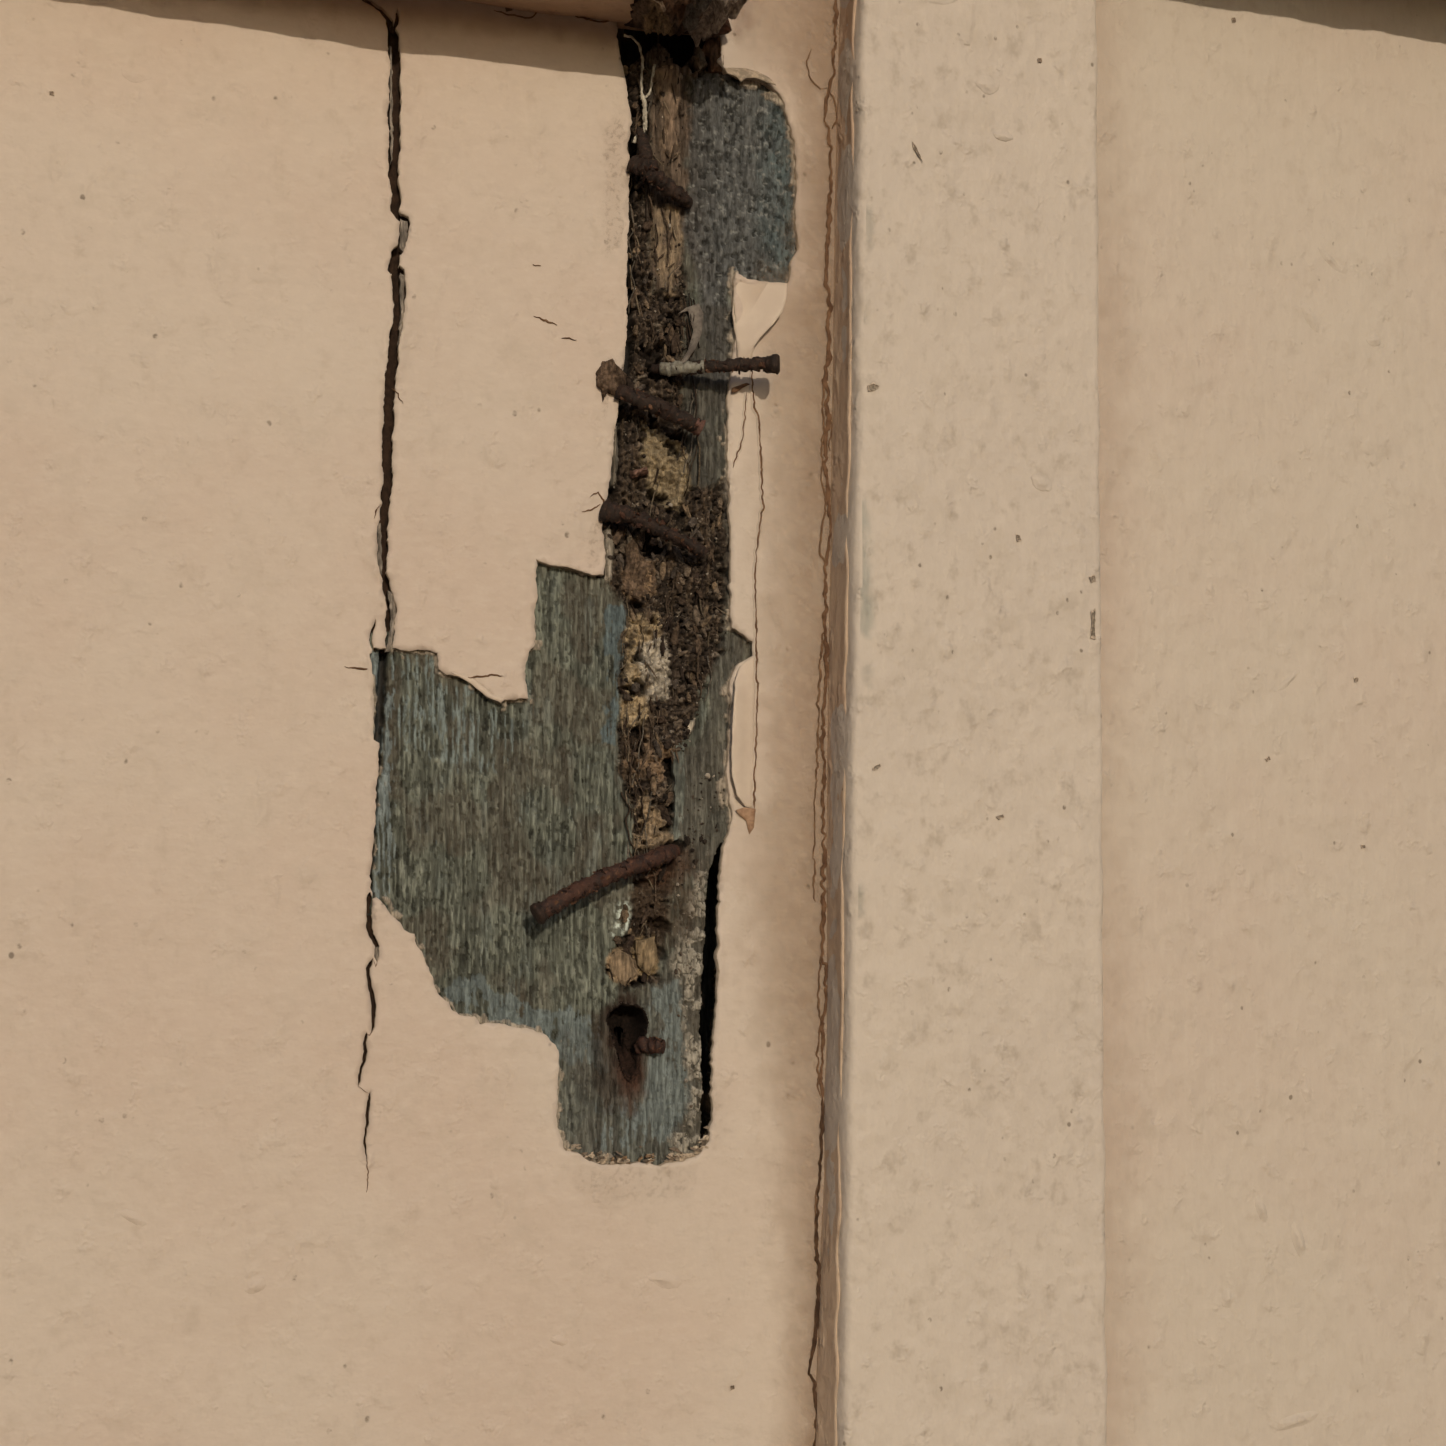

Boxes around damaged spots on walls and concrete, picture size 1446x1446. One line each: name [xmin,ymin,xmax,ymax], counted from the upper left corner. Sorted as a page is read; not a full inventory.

crack [344,0,410,670]
crack [468,672,501,680]
peeling [368,28,797,1165]
crack [358,892,379,1192]